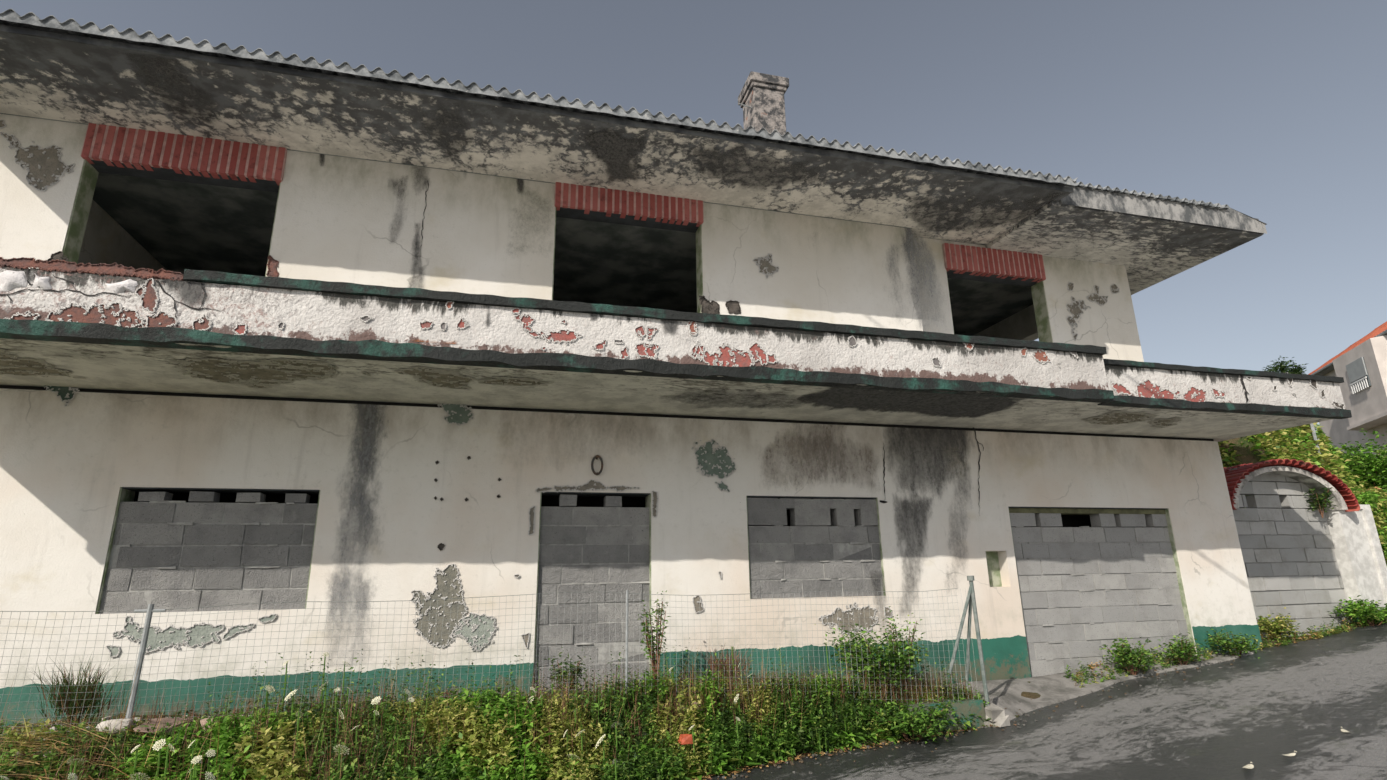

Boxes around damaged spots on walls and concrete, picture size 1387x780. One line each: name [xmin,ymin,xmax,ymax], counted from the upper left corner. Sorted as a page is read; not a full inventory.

spalling [0,119,76,192]
water stain [585,131,642,181]
water stain [691,146,821,188]
water stain [413,225,422,283]
water stain [904,195,1060,306]
peeling [4,278,212,331]
peeling [511,307,660,360]
peeling [687,295,777,367]
water stain [332,404,383,634]
water stain [675,385,1023,588]
peeling [410,543,498,651]
peeling [106,613,278,658]